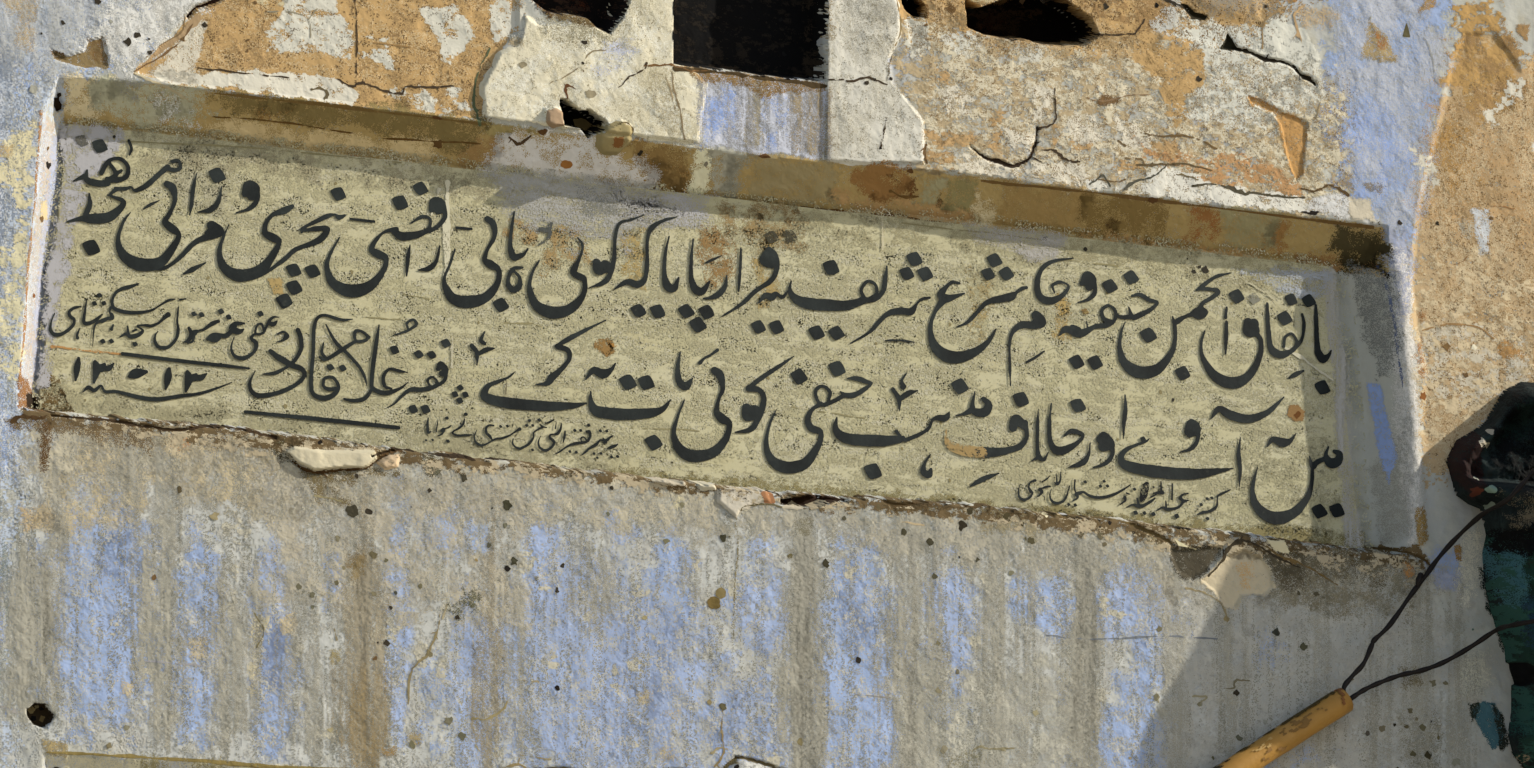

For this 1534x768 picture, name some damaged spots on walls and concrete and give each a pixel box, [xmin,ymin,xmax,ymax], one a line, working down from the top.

peeling [1,0,109,69]
crack [1097,0,1184,37]
spalling [1181,4,1207,20]
crack [1234,0,1321,119]
peeling [1361,0,1530,125]
crack [970,88,1350,215]
flaking render [72,418,403,472]
spalling [420,459,861,518]
spalling [879,506,1428,611]
crack [471,680,568,768]
crack [639,711,776,768]
crack [972,744,1014,752]